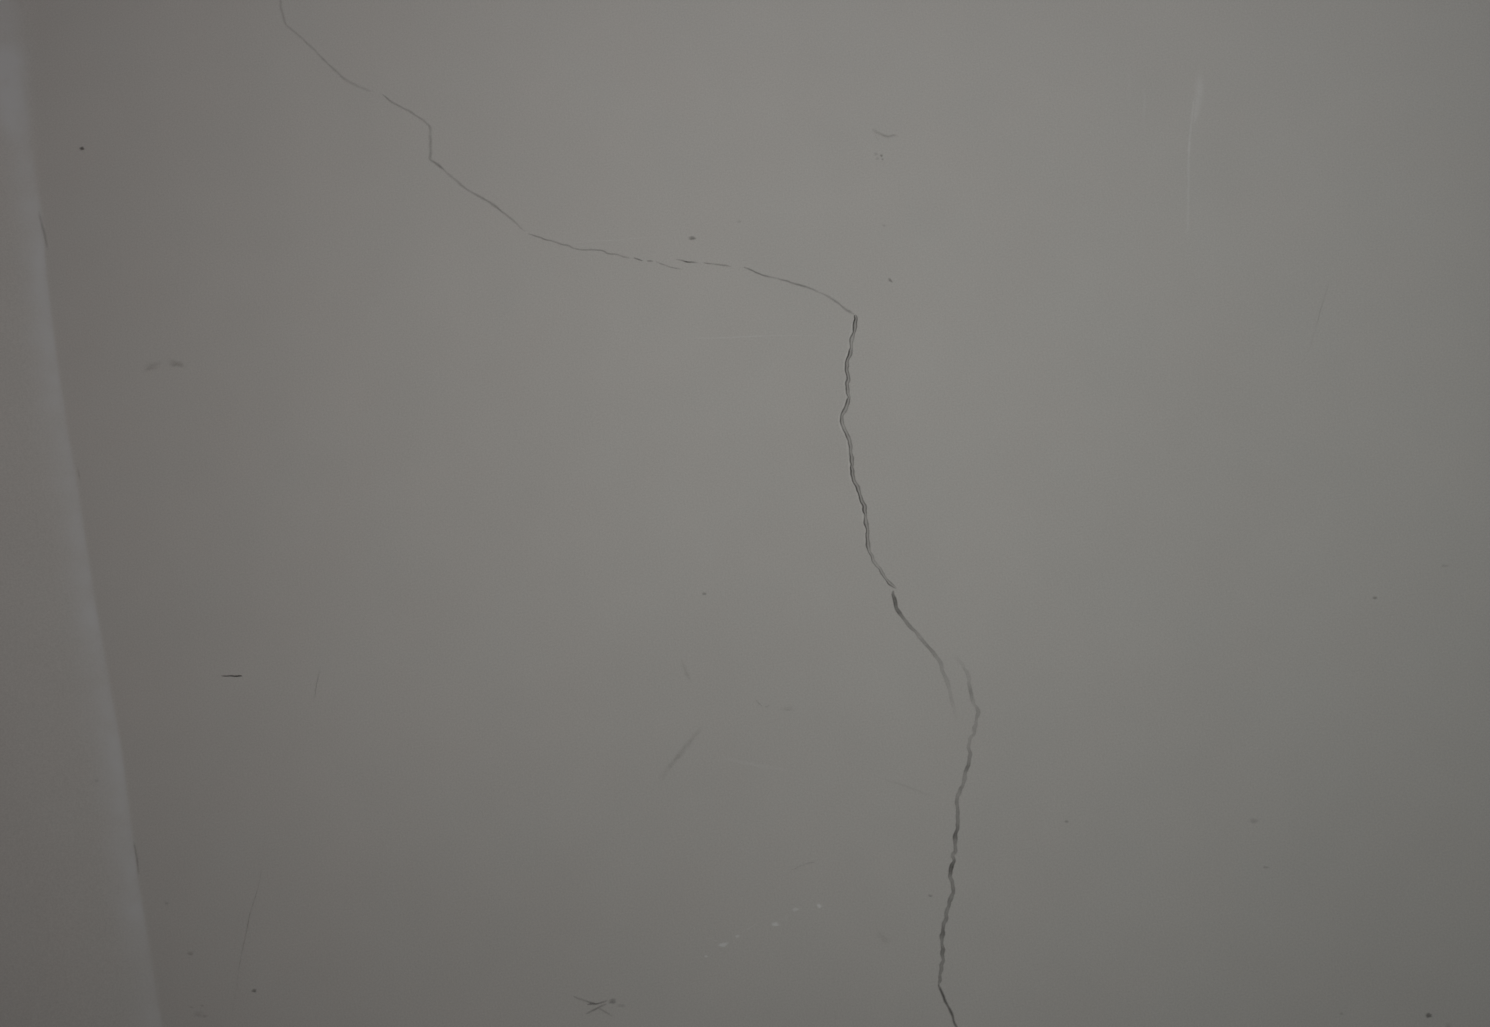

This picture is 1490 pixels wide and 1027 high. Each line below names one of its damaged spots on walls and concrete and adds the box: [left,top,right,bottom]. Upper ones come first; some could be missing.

crack [838,315,867,548]